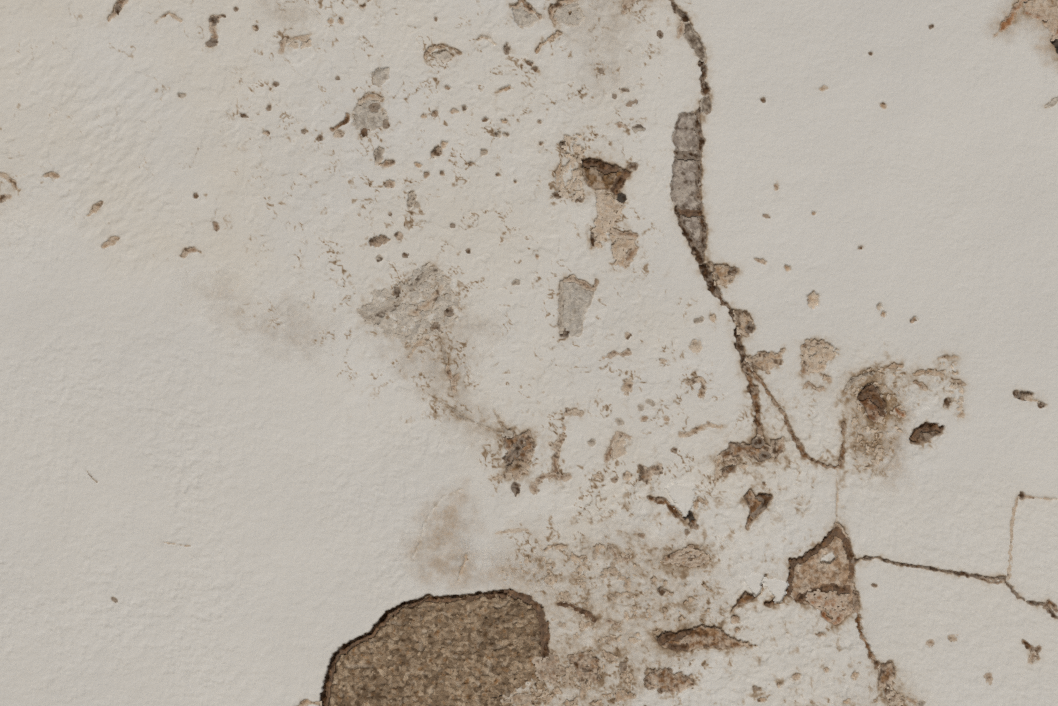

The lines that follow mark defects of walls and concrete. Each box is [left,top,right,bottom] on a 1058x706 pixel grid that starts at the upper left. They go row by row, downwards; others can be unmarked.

crack [622,0,637,15]
spalling [993,0,1058,56]
peeling [357,263,460,393]
peeling [557,275,598,340]
spalling [551,134,638,268]
crack [670,0,846,524]
spalling [435,398,540,497]
spalling [844,356,965,469]
spalling [299,463,859,706]
crack [851,492,1058,706]